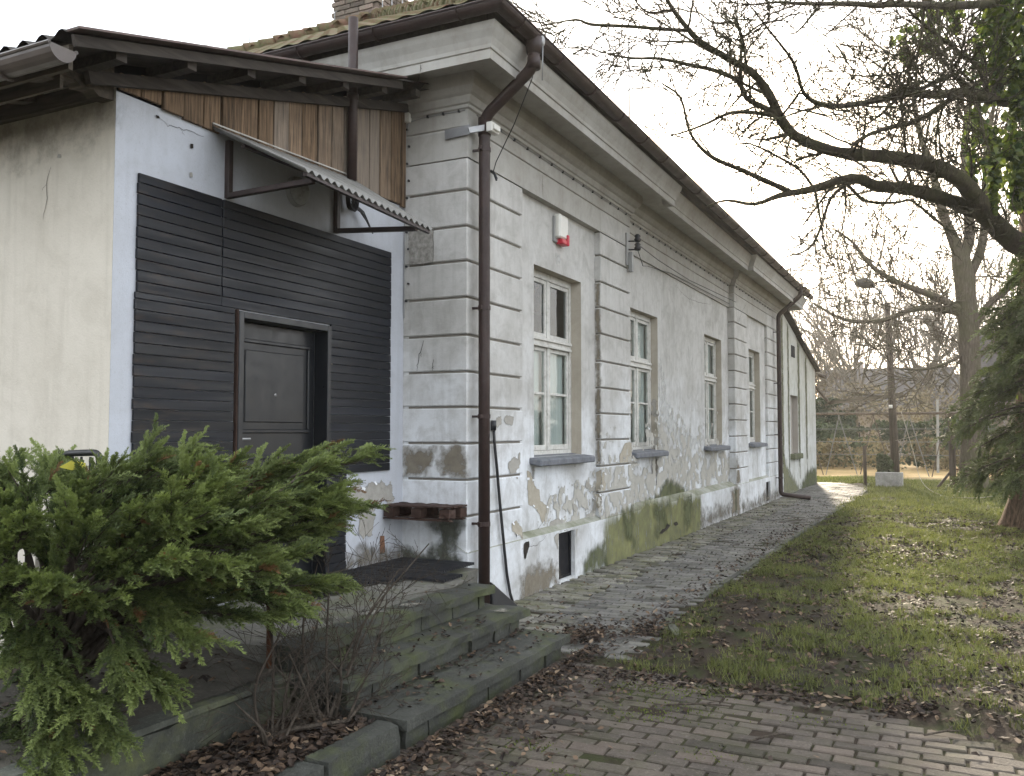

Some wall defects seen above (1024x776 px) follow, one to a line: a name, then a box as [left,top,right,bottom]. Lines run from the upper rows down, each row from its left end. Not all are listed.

peeling [348,479,395,553]
peeling [508,399,730,548]